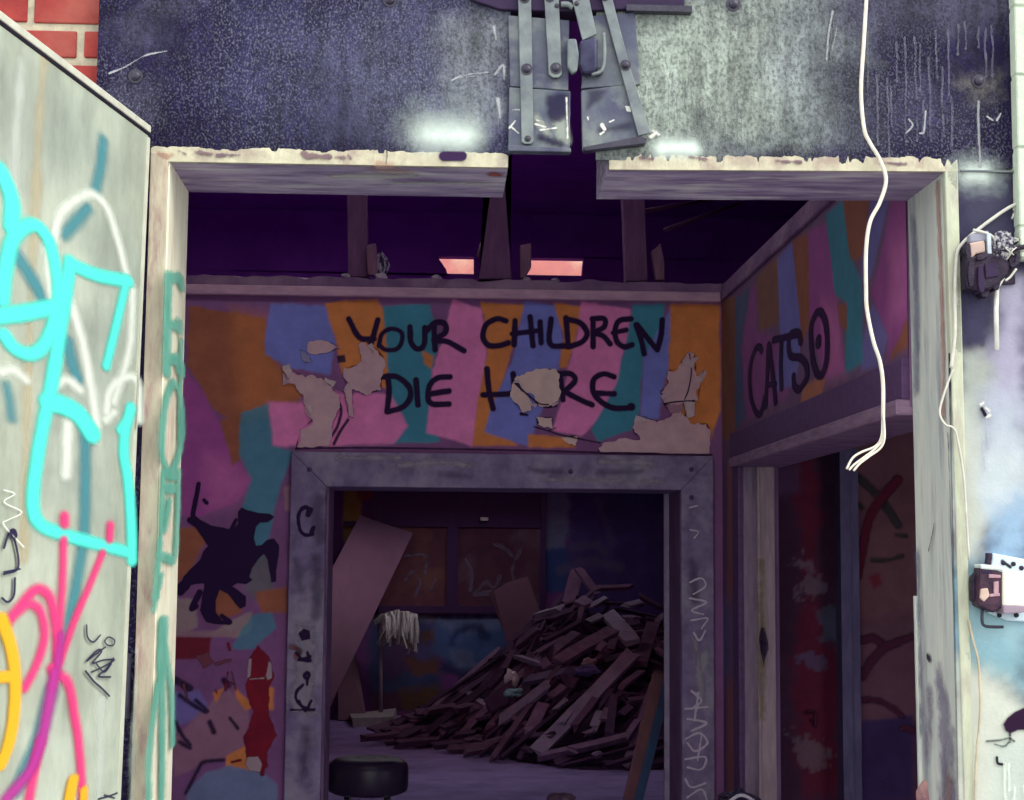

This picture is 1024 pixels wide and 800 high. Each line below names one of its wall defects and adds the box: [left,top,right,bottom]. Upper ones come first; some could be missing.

leakage [904,25,993,147]
peeling [301,151,352,160]
flaking render [282,340,386,448]
flaking render [510,368,577,446]
flaking render [598,352,711,454]